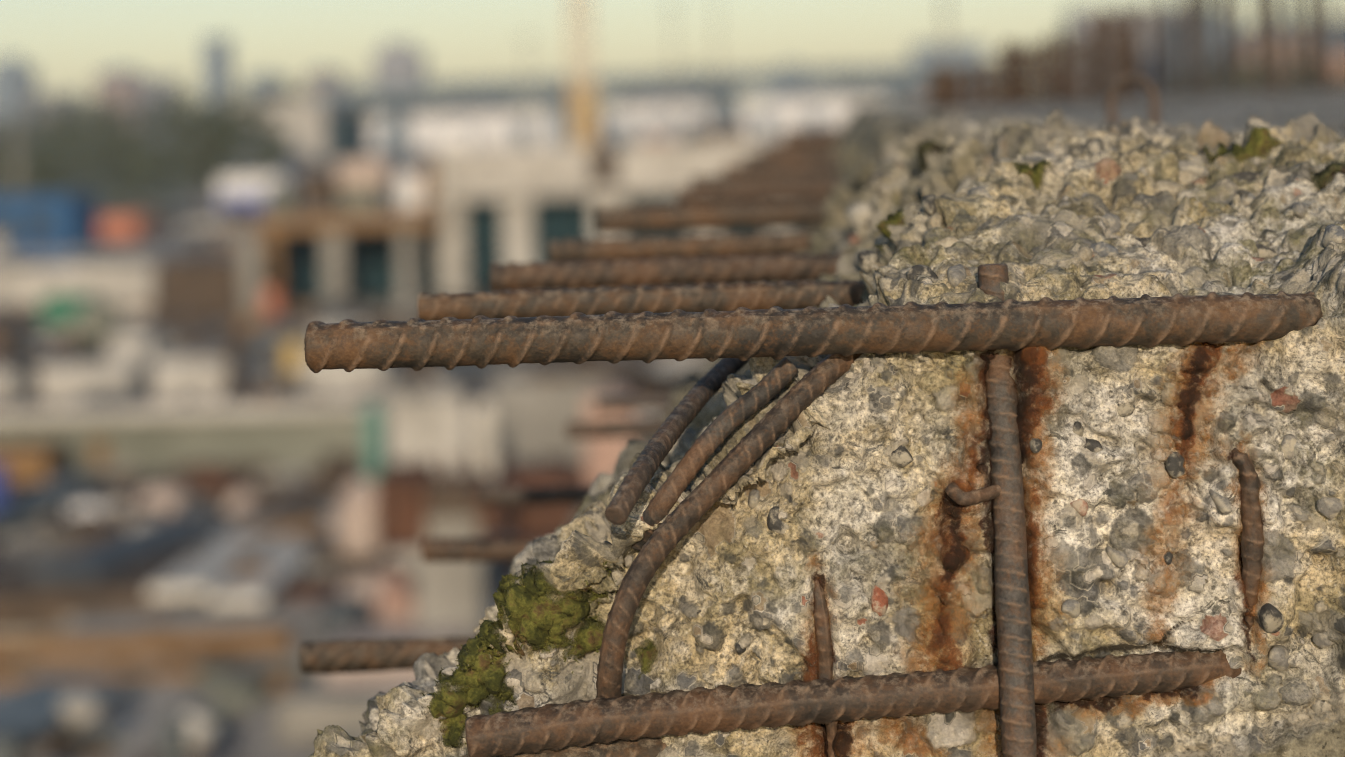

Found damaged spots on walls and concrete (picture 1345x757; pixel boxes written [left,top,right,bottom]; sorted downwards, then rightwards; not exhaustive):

spalling [309,354,829,757]
corrosion [299,126,1323,757]
spalling [621,103,1345,757]